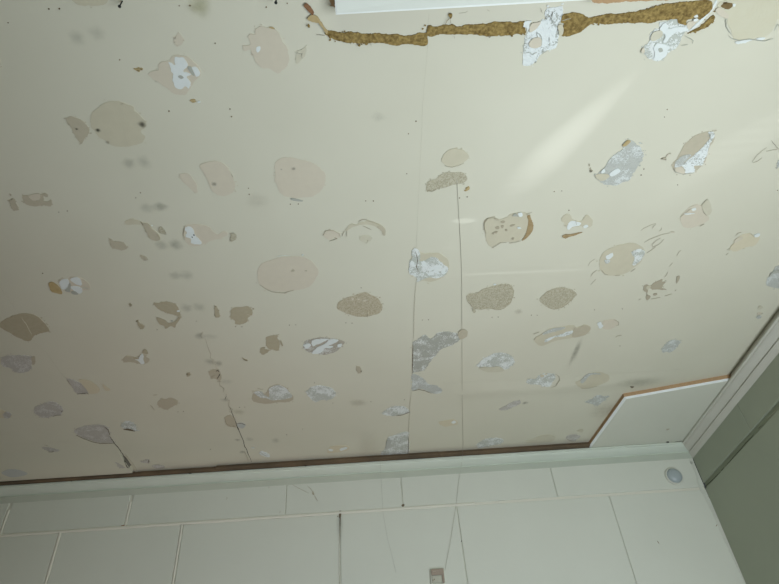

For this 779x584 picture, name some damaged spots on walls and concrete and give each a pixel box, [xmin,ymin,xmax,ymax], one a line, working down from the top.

peeling [653,15,698,61]
peeling [134,32,205,103]
peeling [661,130,717,176]
peeling [482,212,534,248]
peeling [337,292,383,318]
peeling [466,283,515,313]